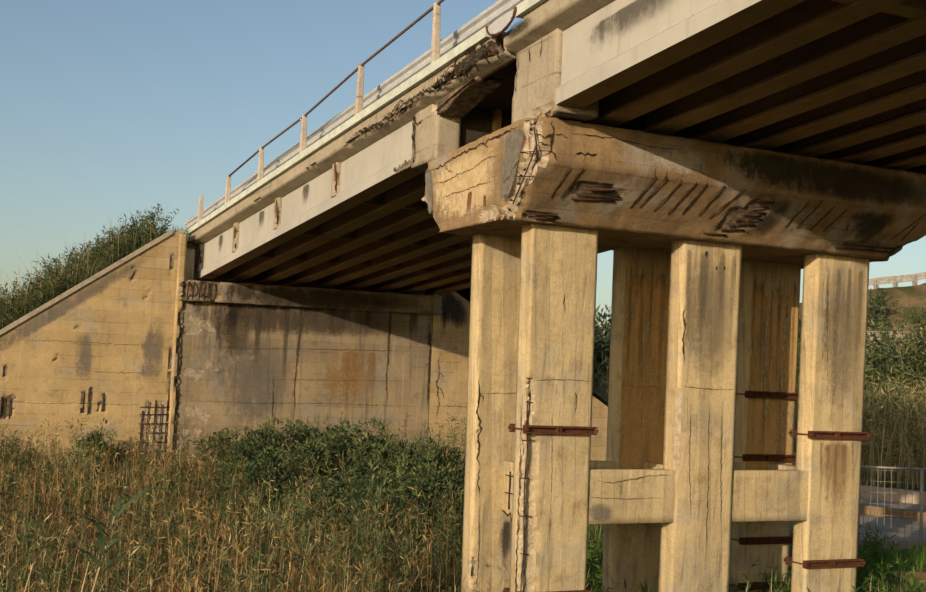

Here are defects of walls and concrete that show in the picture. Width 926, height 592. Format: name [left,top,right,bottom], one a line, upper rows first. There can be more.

spalling [344,30,510,173]
crack [345,40,519,199]
spalling [479,101,561,223]
crack [539,122,746,218]
damp [729,152,923,203]
damp [845,212,891,243]
spalling [80,387,108,424]
damp [143,333,160,374]
spalling [137,280,255,463]
damp [193,285,400,415]
crack [173,303,522,592]
spalling [505,378,540,592]